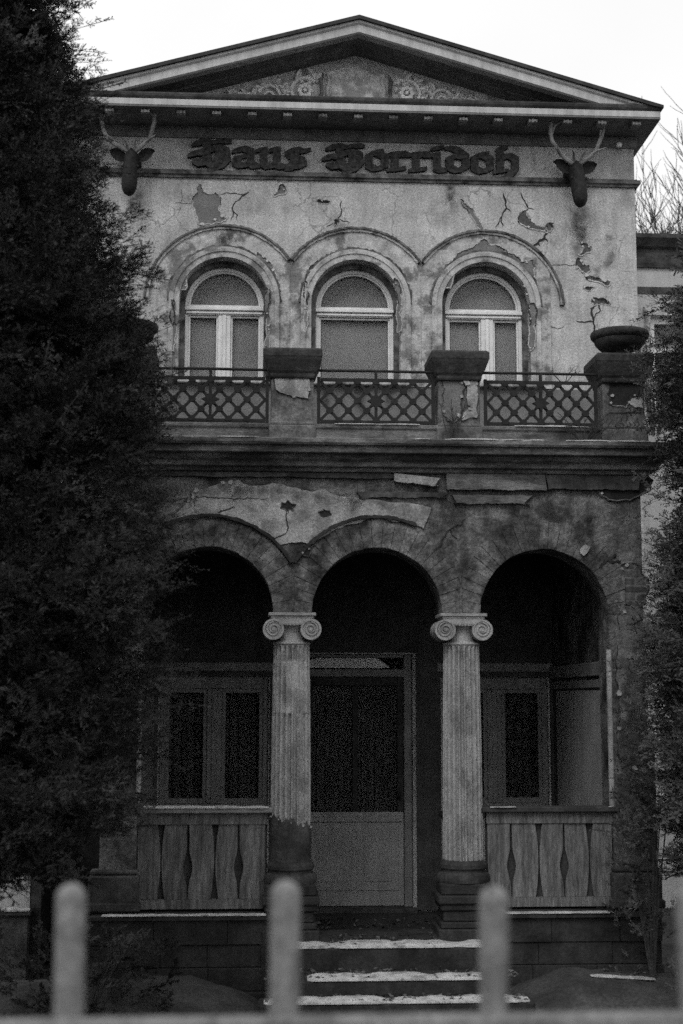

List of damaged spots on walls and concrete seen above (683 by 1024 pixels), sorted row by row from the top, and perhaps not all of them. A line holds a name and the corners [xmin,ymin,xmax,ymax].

flaking render [192,184,229,226]
crack [221,192,248,219]
crack [496,193,534,227]
flaking render [517,210,555,233]
flaking render [445,199,538,351]
flaking render [575,242,612,306]
flaking render [441,381,478,423]
flaking render [607,383,643,409]
flaking render [597,476,654,502]
crack [194,496,289,539]
flaking render [174,480,432,557]